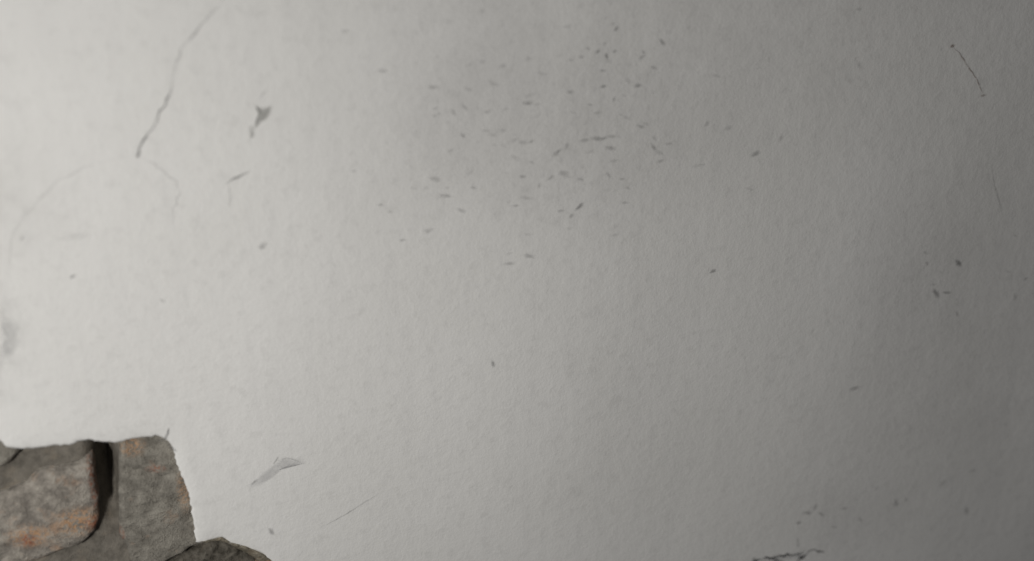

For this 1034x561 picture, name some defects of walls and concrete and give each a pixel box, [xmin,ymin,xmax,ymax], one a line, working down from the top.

flaking render [0,435,271,561]